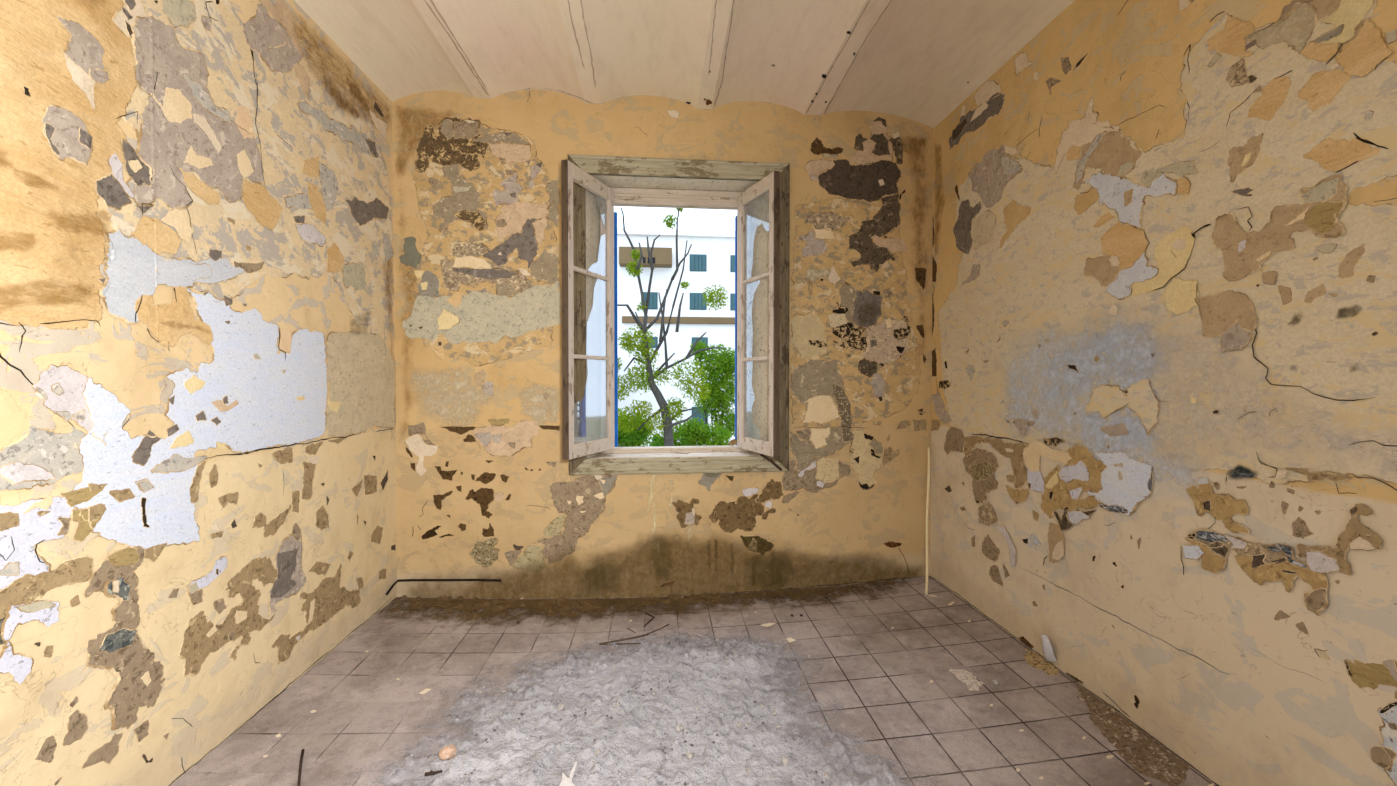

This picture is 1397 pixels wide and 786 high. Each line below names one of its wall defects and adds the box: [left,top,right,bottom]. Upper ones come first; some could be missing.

crack [0,319,101,385]
peeling [0,0,618,786]
peeling [658,0,1397,786]
crack [1252,321,1371,401]
leakage [420,473,919,599]